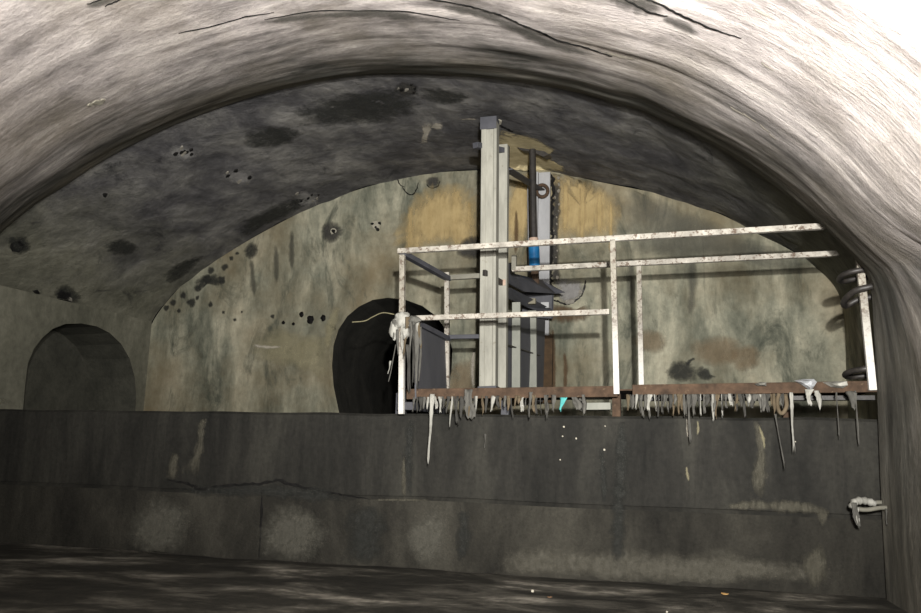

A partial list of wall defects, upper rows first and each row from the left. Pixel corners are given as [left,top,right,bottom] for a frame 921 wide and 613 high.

crack [615,0,741,39]